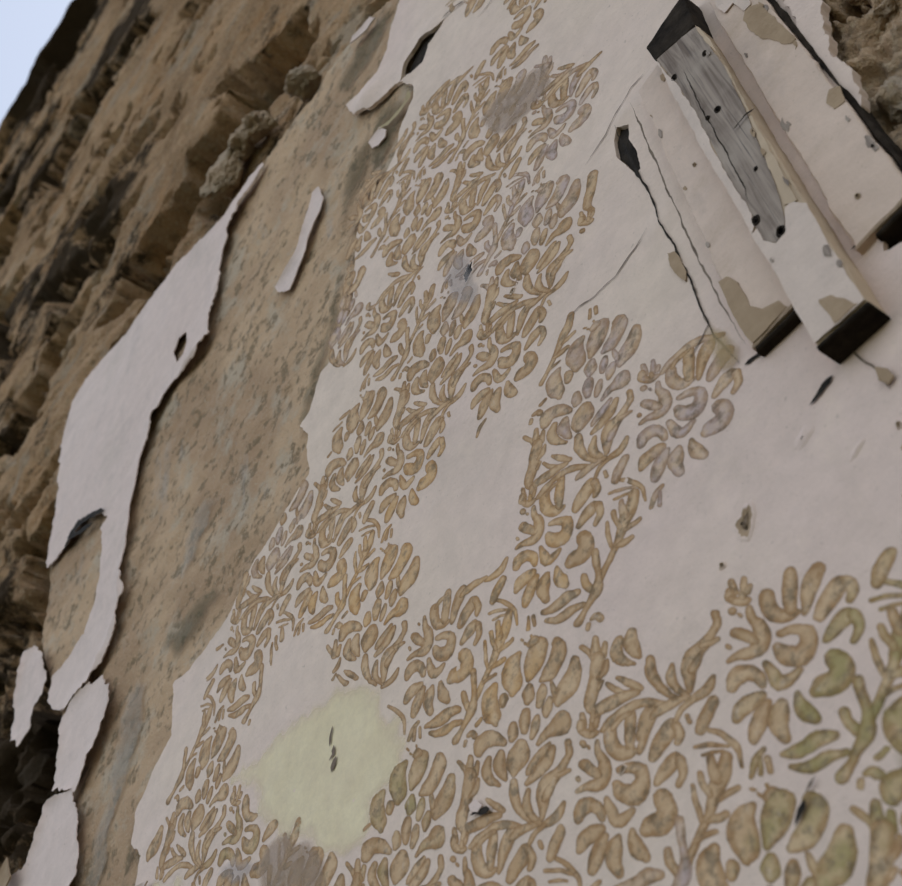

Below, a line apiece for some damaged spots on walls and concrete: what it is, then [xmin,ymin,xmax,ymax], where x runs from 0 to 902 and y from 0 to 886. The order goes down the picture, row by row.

peeling [350,17,376,44]
peeling [743,2,798,49]
peeling [826,86,845,109]
peeling [368,127,387,149]
peeling [864,135,879,152]
crack [578,74,718,354]
peeling [275,187,324,292]
peeling [718,276,787,343]
peeling [818,295,858,323]
crack [735,353,760,365]
peeling [0,163,264,886]
damp [243,691,399,886]